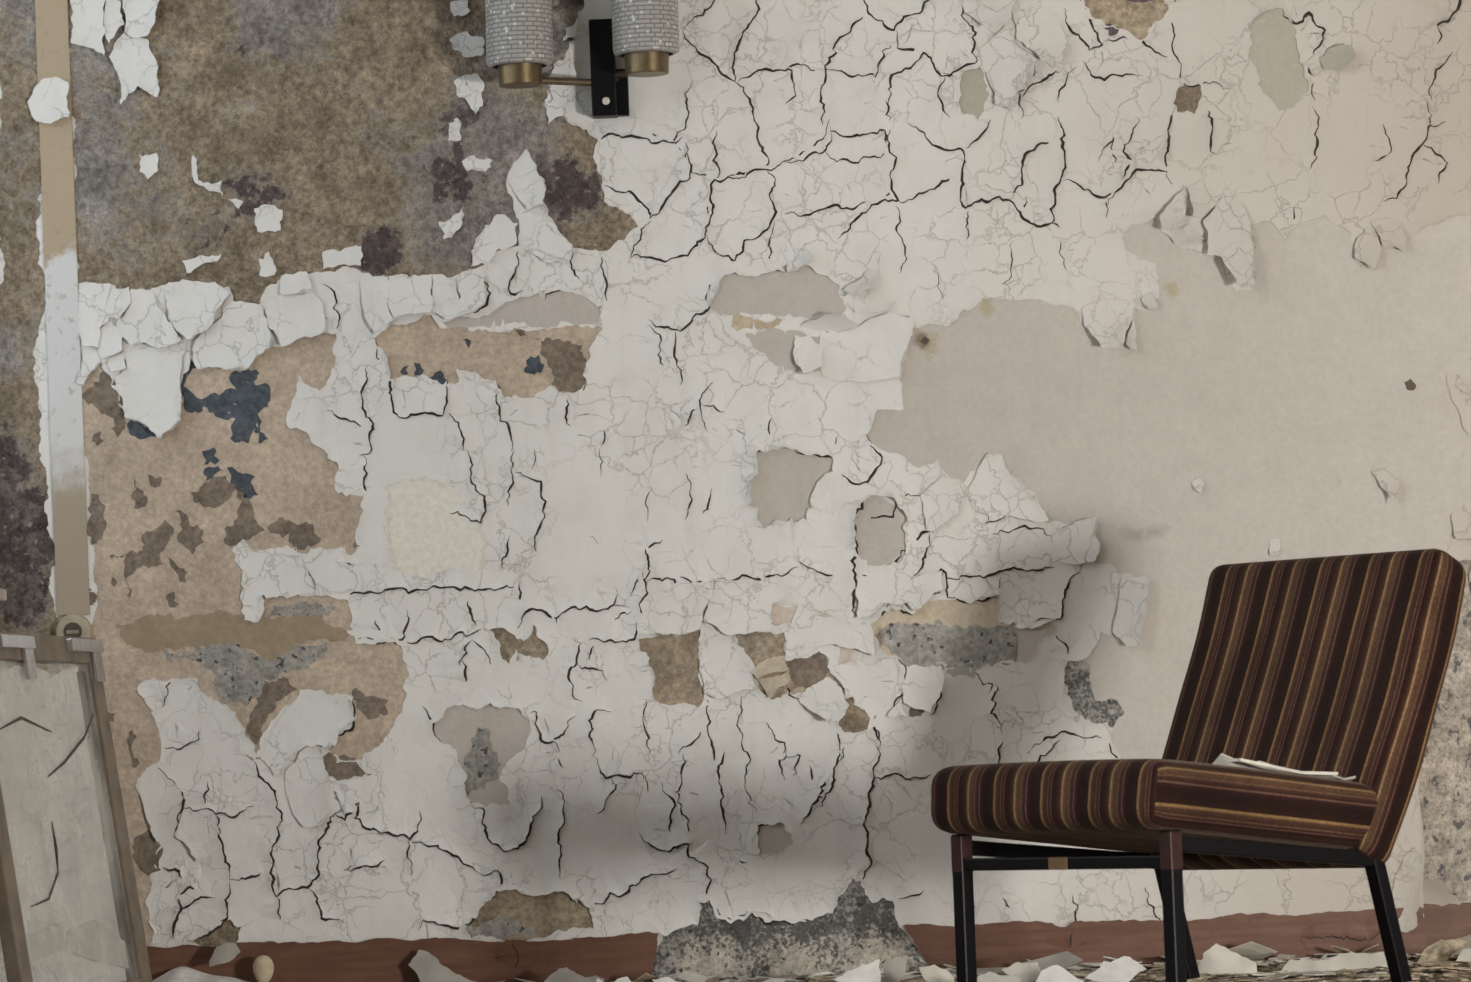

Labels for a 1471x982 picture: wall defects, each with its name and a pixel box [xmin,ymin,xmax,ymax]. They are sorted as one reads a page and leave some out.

peeling [944,0,1068,128]
peeling [1081,0,1191,53]
peeling [1155,67,1218,130]
peeling [1228,0,1325,127]
crack [1282,0,1471,213]
crack [449,0,1232,385]
crack [1274,203,1317,220]
peeling [0,0,651,967]
peeling [622,187,1471,933]
crack [149,281,1122,969]
crack [1046,887,1163,948]